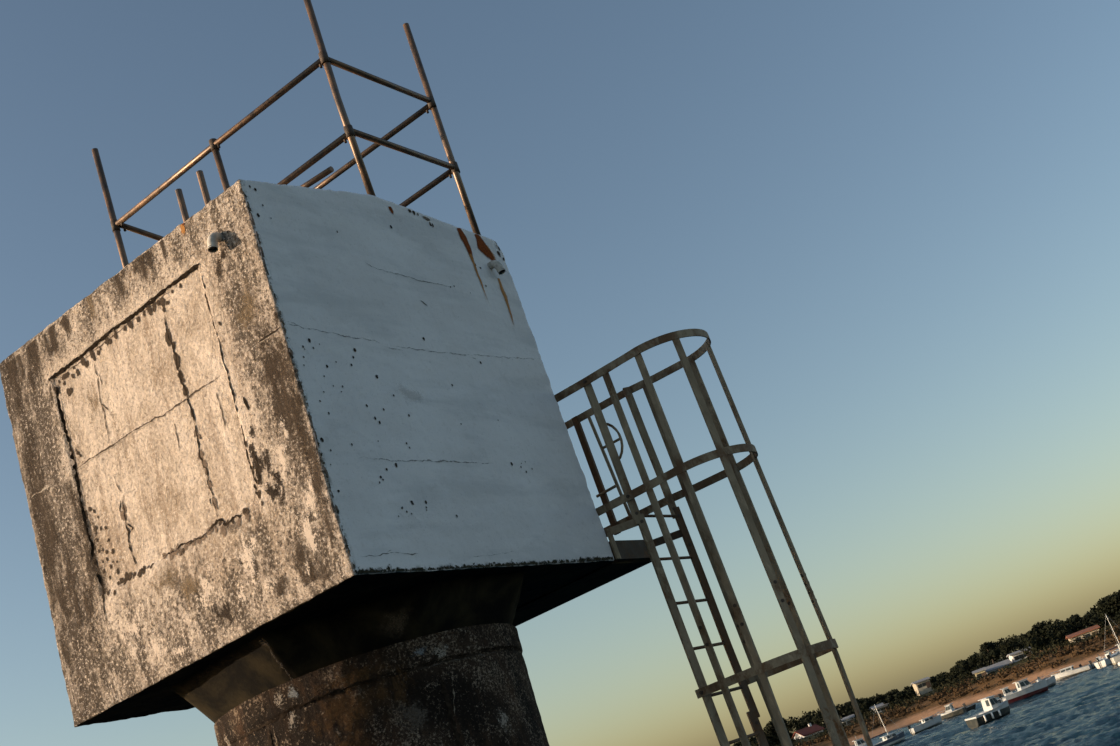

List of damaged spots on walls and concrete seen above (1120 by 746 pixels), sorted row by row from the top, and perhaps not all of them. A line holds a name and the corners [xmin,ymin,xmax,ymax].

leakage [113,240,168,301]
leakage [216,249,229,281]
rust [457,228,495,295]
leakage [4,315,71,415]
crack [31,263,263,629]
leakage [20,430,112,687]
leakage [274,686,298,728]